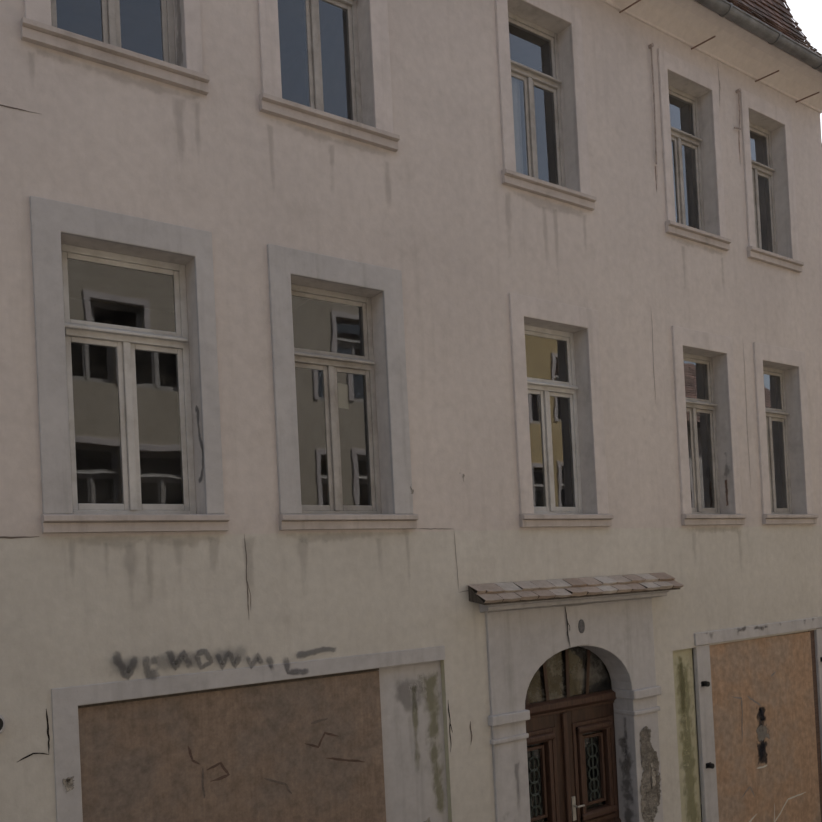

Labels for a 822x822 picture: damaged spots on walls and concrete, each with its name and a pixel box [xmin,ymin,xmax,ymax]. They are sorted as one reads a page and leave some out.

crack [0,533,39,541]
crack [18,709,50,762]
peeling [640,726,661,822]